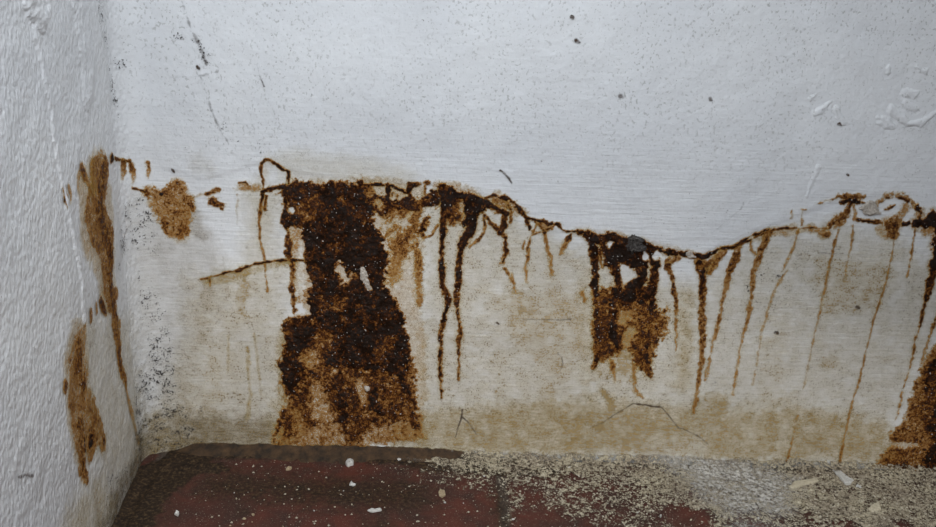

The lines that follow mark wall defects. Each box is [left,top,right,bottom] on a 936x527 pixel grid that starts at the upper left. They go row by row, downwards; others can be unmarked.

corrosion [63,150,225,485]
damp [78,266,286,527]
corrosion [236,158,936,472]
damp [393,224,905,466]
crack [611,403,699,437]